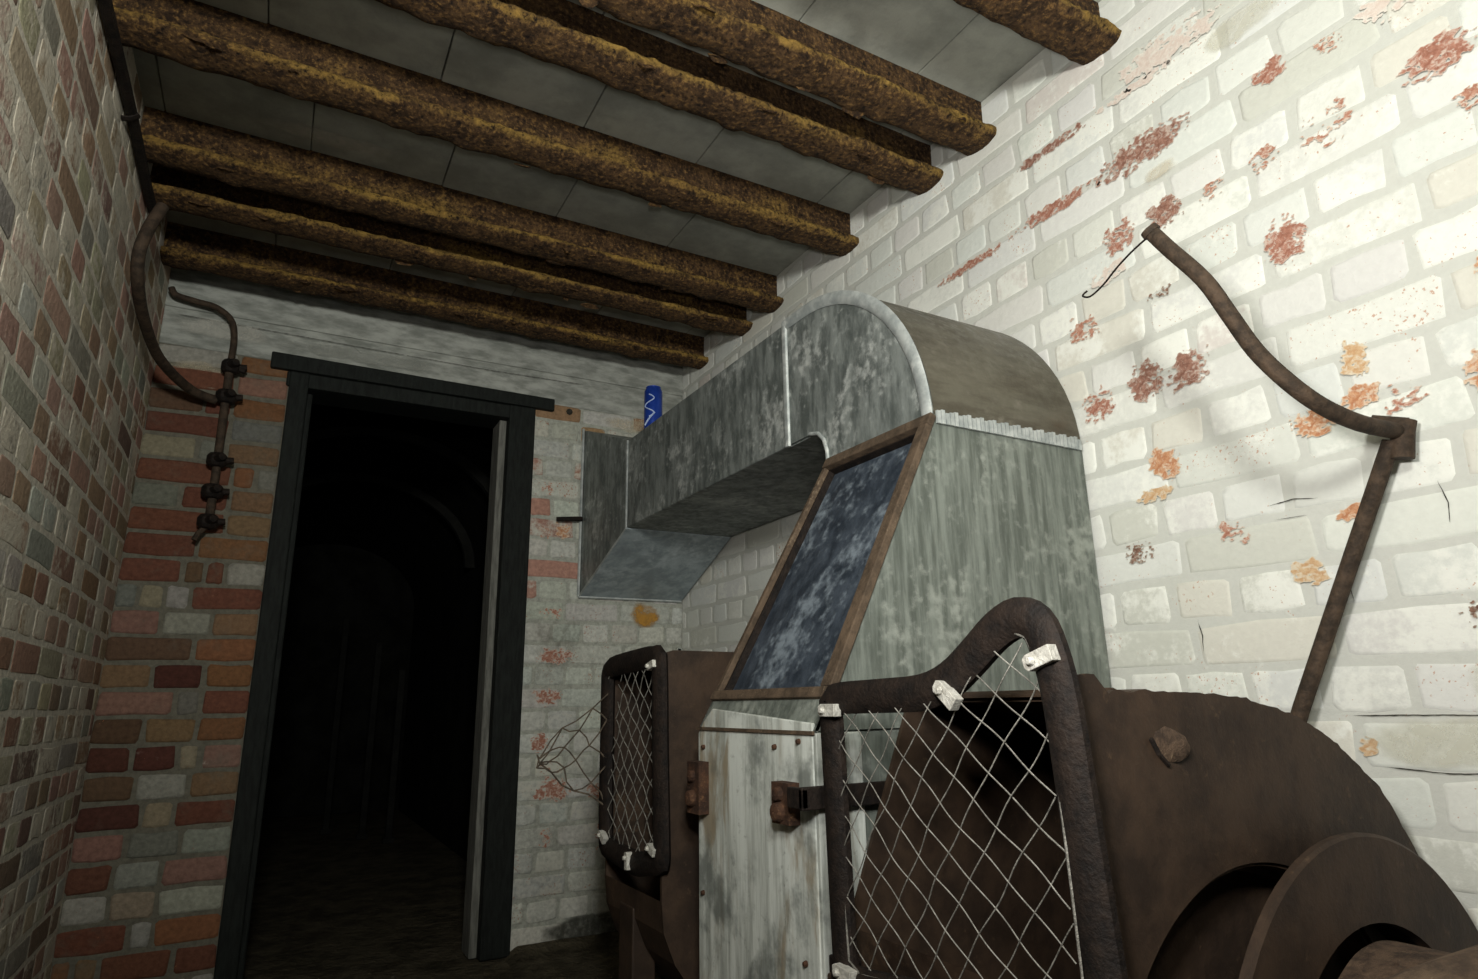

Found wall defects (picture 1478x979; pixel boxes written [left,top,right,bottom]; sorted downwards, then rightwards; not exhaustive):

peeling [1017,0,1223,172]
peeling [1396,25,1478,88]
peeling [1451,83,1478,113]
peeling [937,111,1191,287]
peeling [1263,212,1308,264]
peeling [1082,344,1210,424]
peeling [1462,348,1478,390]